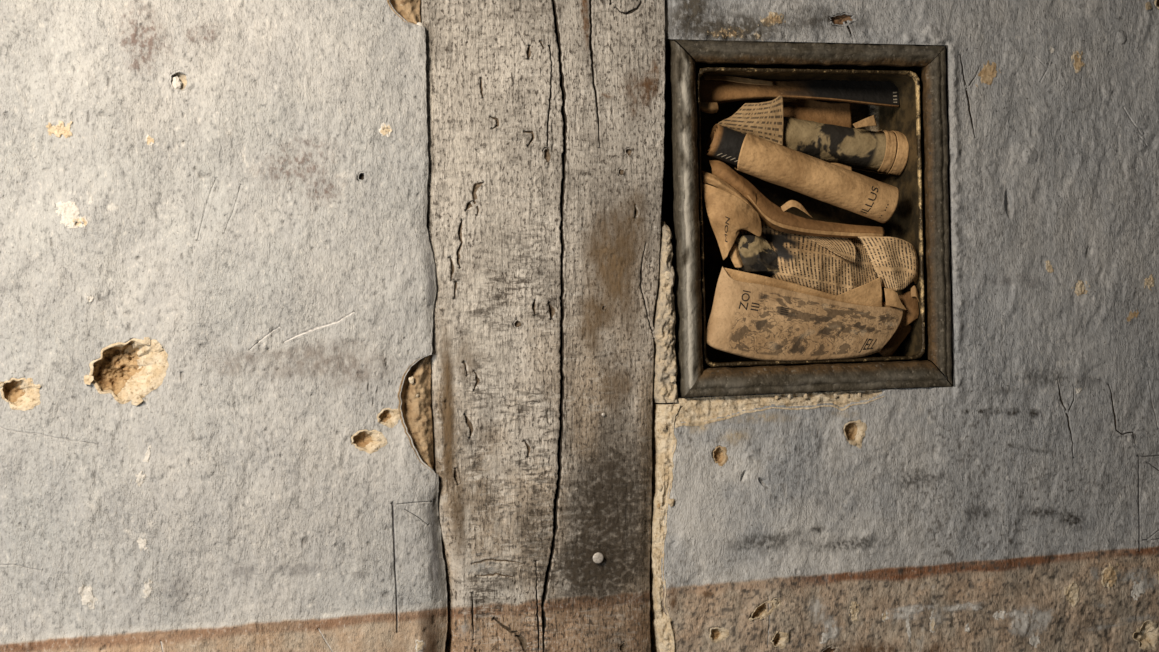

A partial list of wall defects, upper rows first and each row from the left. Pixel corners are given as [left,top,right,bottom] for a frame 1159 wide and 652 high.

flaking render [387,0,424,27]
crack [533,0,603,652]
hole [0,378,41,411]
hole [84,337,169,406]
flaking render [351,355,434,471]
flaking render [649,221,884,652]
crack [1055,379,1076,458]
crack [1106,379,1159,446]
hole [1132,620,1159,651]